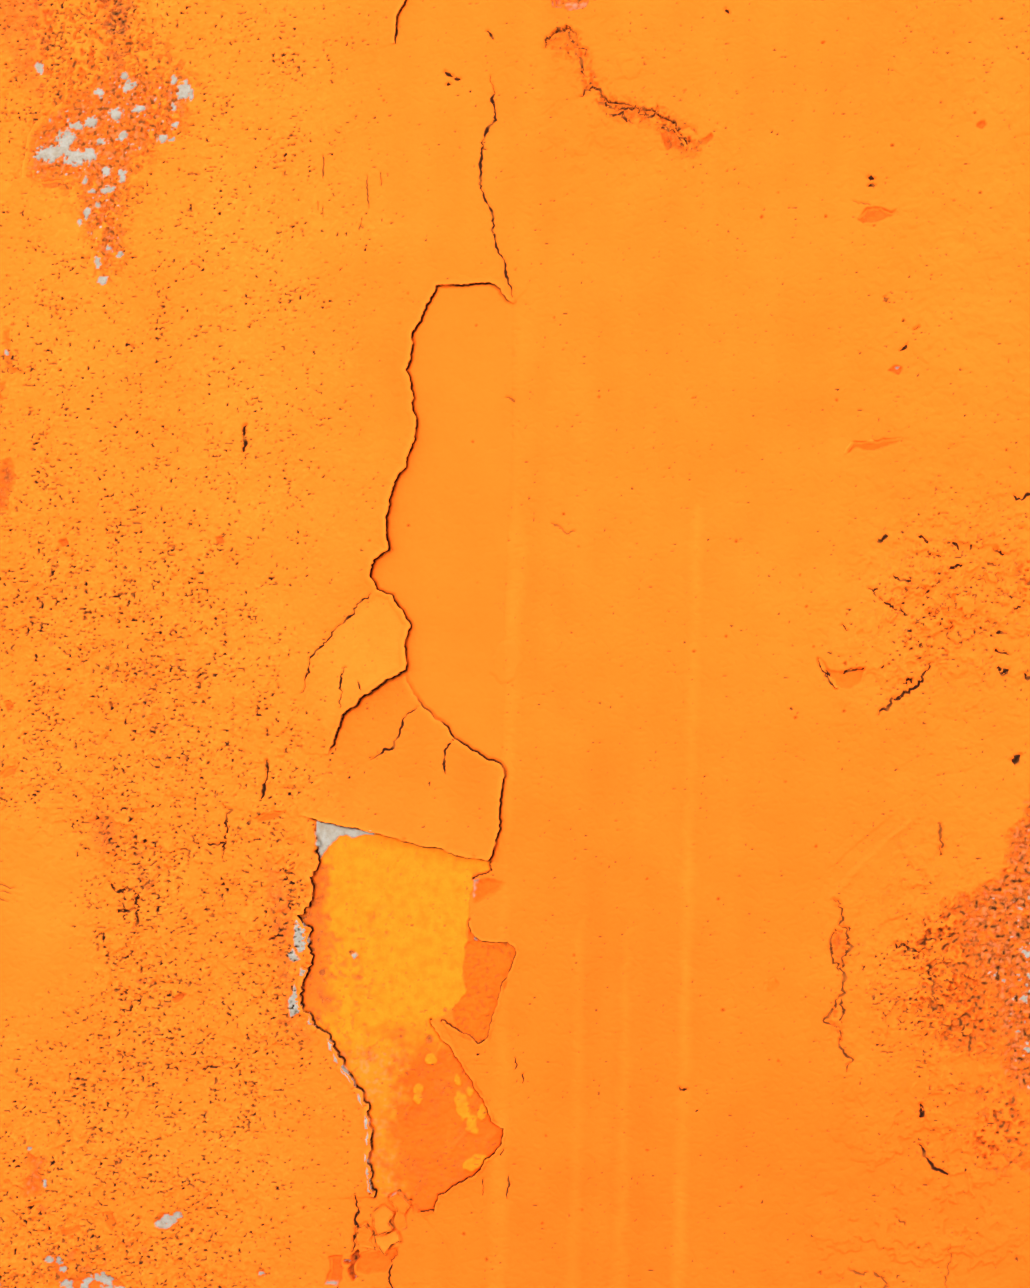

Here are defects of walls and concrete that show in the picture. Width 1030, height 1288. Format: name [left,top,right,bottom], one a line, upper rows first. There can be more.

crack [389,0,407,44]
crack [445,71,513,297]
spalling [551,0,589,11]
peeling [541,26,712,159]
peeling [818,491,1030,724]
peeling [288,821,520,1285]
peeling [827,783,1030,1178]